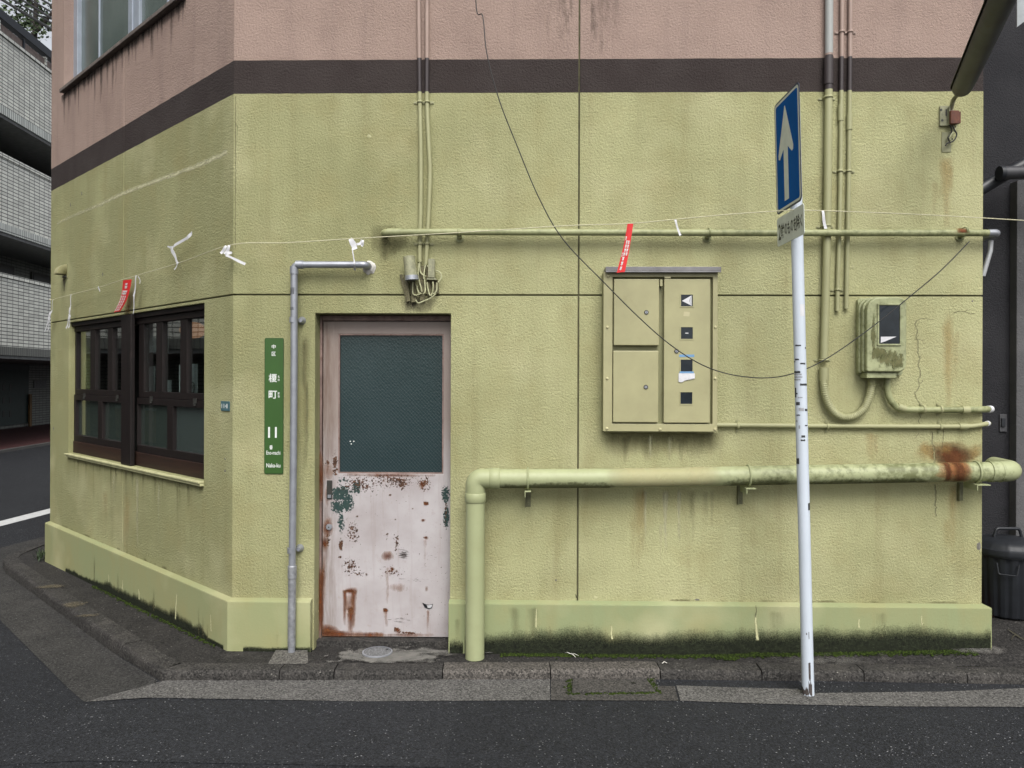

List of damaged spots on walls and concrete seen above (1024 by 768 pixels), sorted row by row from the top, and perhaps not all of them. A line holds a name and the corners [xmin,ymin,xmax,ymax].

crack [914,309,975,517]
rust [932,445,972,481]
leakage [65,569,223,649]
leakage [450,641,463,654]
leakage [484,629,991,655]